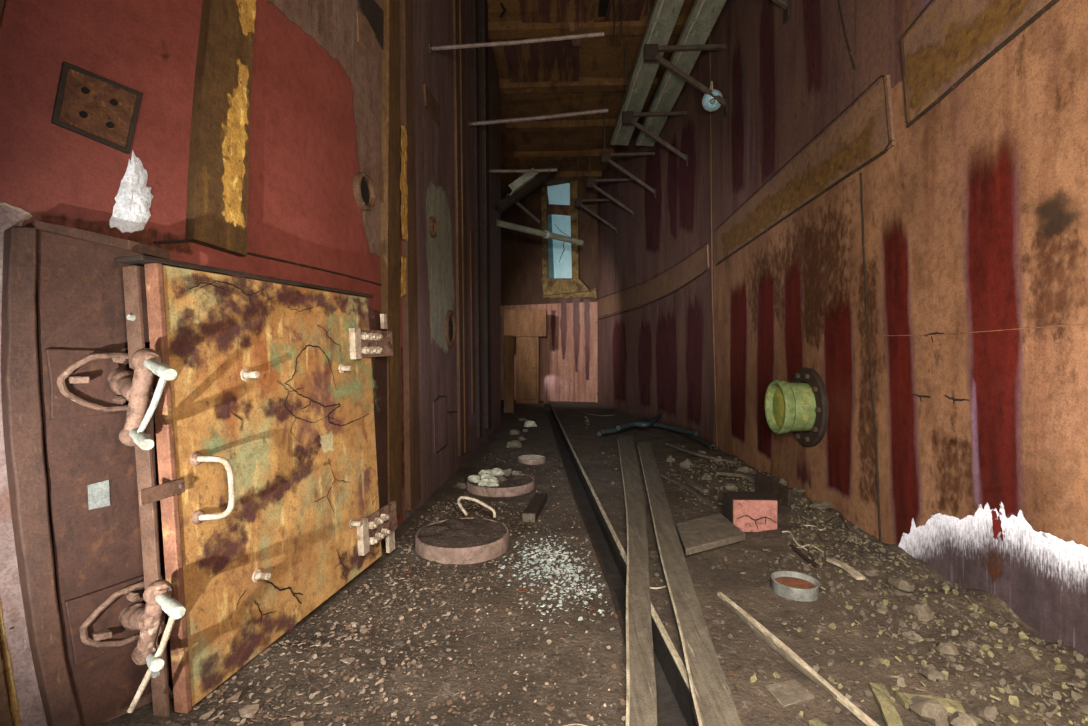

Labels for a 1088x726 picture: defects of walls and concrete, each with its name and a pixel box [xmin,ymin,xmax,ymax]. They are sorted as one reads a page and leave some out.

crack [188,280,266,308]
crack [277,307,369,442]
corrosion [215,392,251,419]
corrosion [265,399,302,422]
corrosion [198,435,329,574]
crack [314,463,350,512]
corrosion [339,542,379,580]
peeling [898,502,1088,654]
crack [237,581,303,627]
corrosion [200,614,296,692]